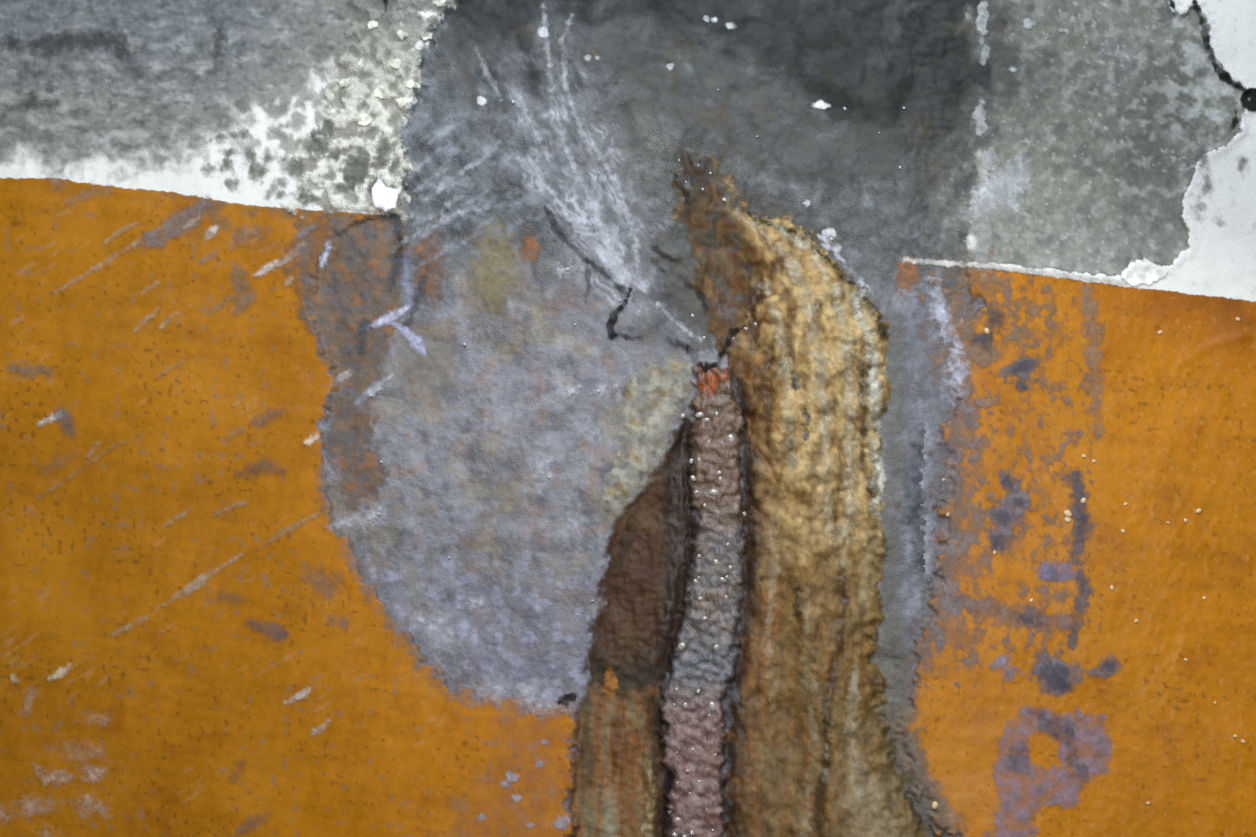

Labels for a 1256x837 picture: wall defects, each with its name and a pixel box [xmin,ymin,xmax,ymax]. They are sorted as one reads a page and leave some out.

leakage [0,0,407,198]
leakage [971,156,1030,217]
crack [607,287,640,339]
leakage [446,0,1018,837]
spalling [281,0,1250,837]
corrosion [557,404,697,837]
leakage [36,767,105,815]